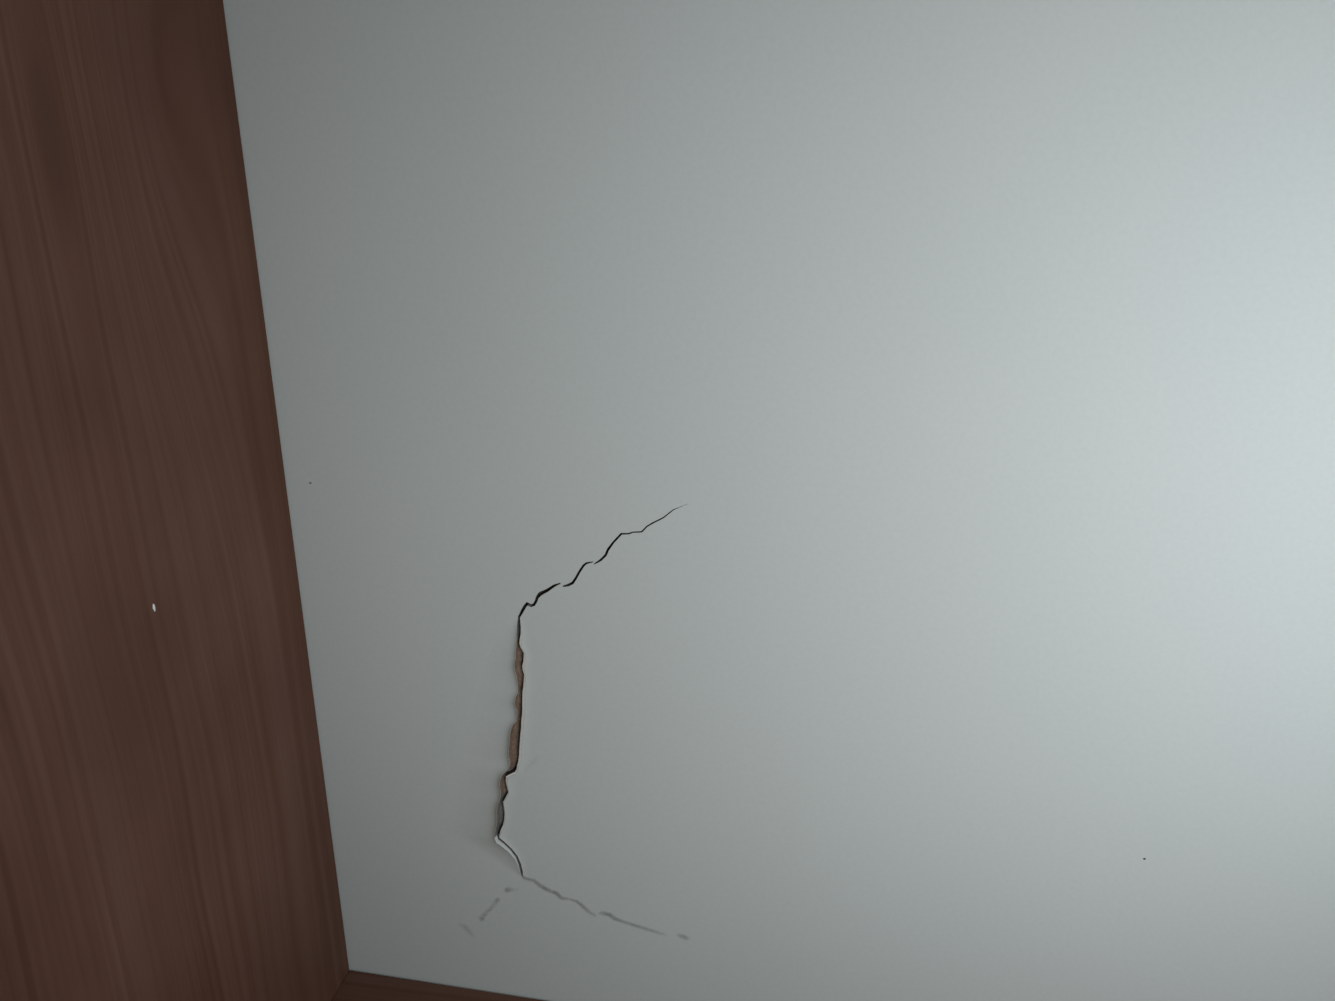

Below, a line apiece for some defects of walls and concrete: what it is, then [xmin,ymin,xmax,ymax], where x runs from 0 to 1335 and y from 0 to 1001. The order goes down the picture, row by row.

crack [445,504,687,877]